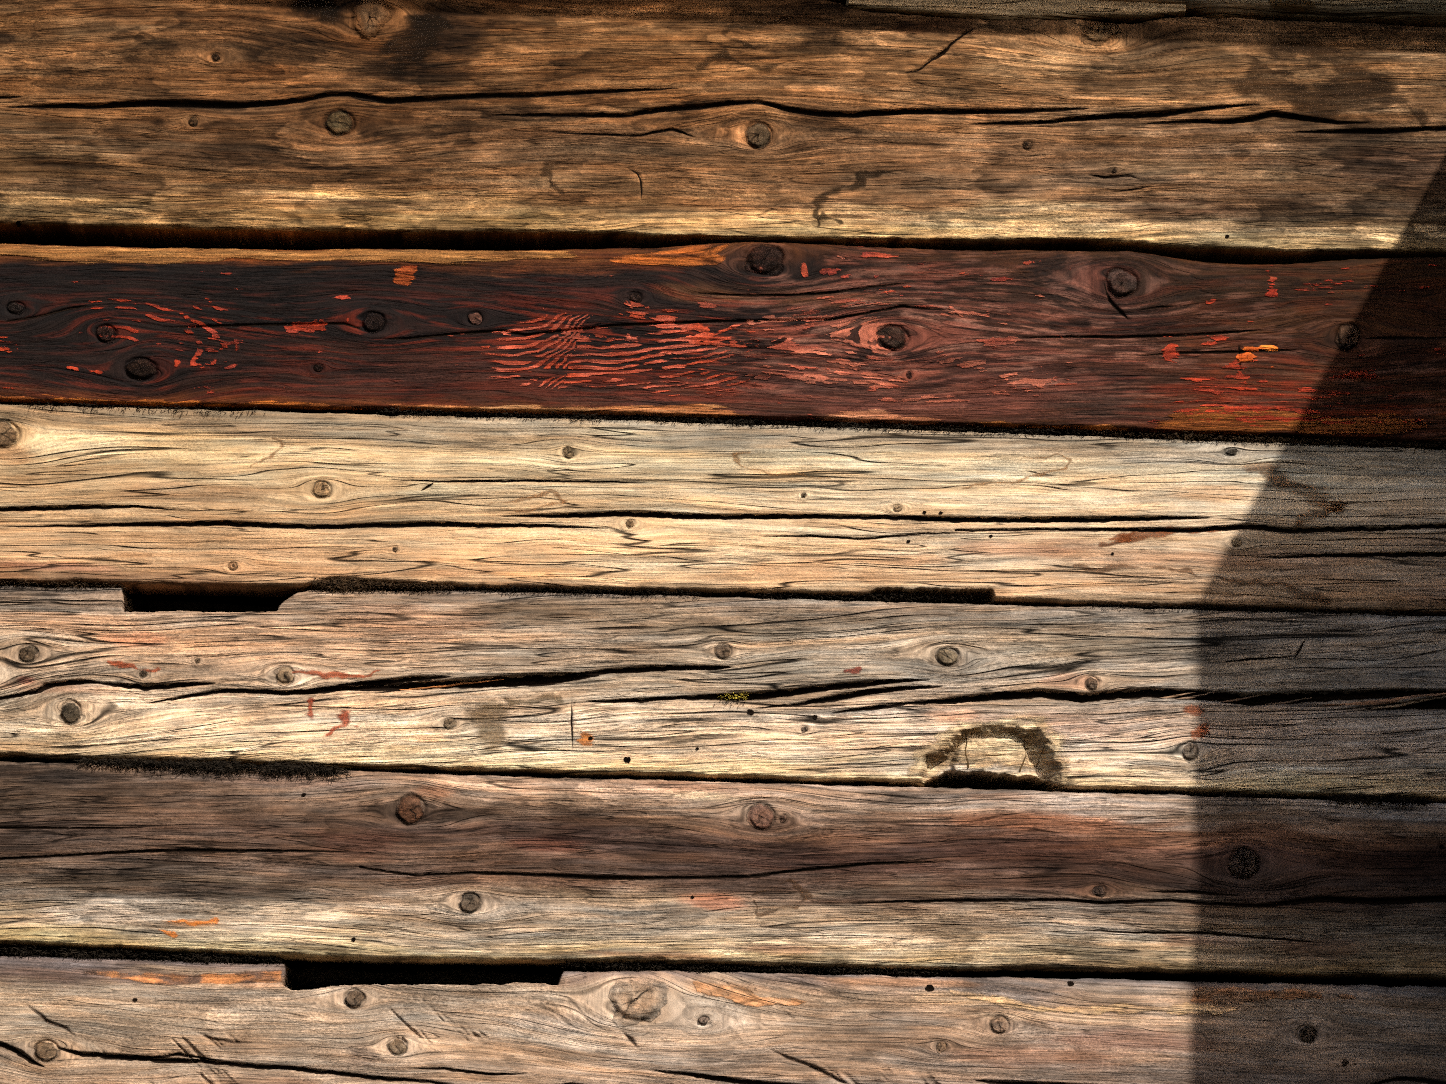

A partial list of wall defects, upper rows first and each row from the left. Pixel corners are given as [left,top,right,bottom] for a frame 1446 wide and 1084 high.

crack [0,88,1446,197]
peeling [0,244,576,285]
peeling [610,243,727,266]
peeling [91,298,243,369]
peeling [397,275,1077,425]
peeling [0,386,362,410]
peeling [1148,345,1432,437]
crack [0,479,1446,558]
crack [0,640,1446,746]
crack [0,1042,526,1084]
crack [654,1070,791,1084]
crack [975,1076,1066,1084]